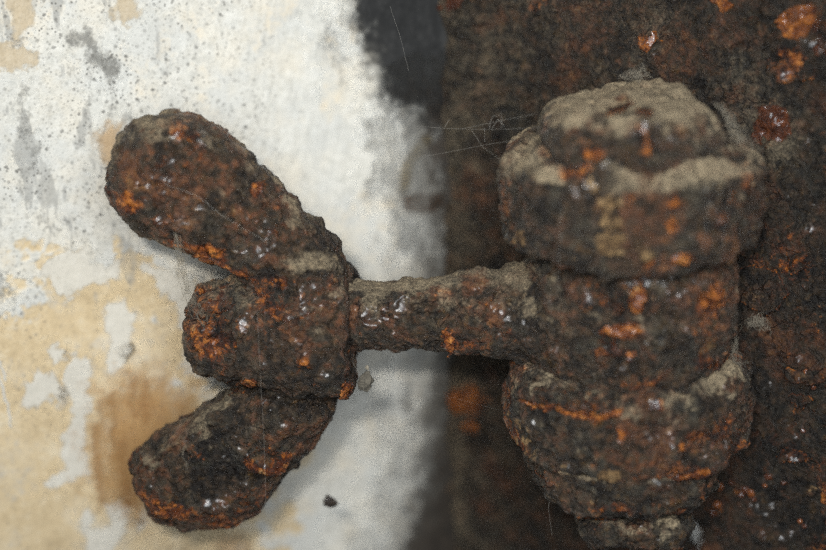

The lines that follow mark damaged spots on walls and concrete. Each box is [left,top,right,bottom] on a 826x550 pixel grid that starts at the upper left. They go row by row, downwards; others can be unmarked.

spalling [0,0,38,72]
corrosion [606,101,653,118]
peeling [41,245,120,303]
peeling [103,298,136,374]
peeling [140,261,195,330]
corrosion [184,297,225,337]
corrosion [598,323,637,362]
peeling [22,342,93,489]
corrosion [96,380,195,506]
corrosion [338,381,354,400]
corrosion [523,386,622,420]
peeling [77,498,148,550]